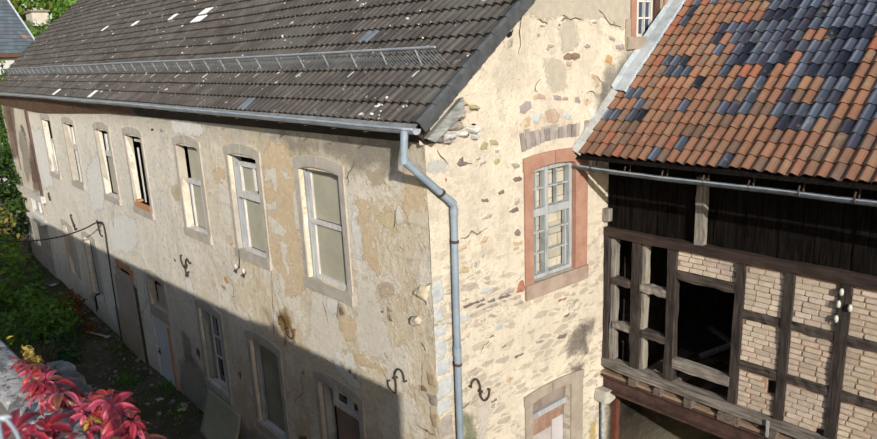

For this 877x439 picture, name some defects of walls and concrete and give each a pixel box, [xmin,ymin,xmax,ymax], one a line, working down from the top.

peeling [263,137,429,389]
rust [278,312,295,341]
damp [569,321,594,354]